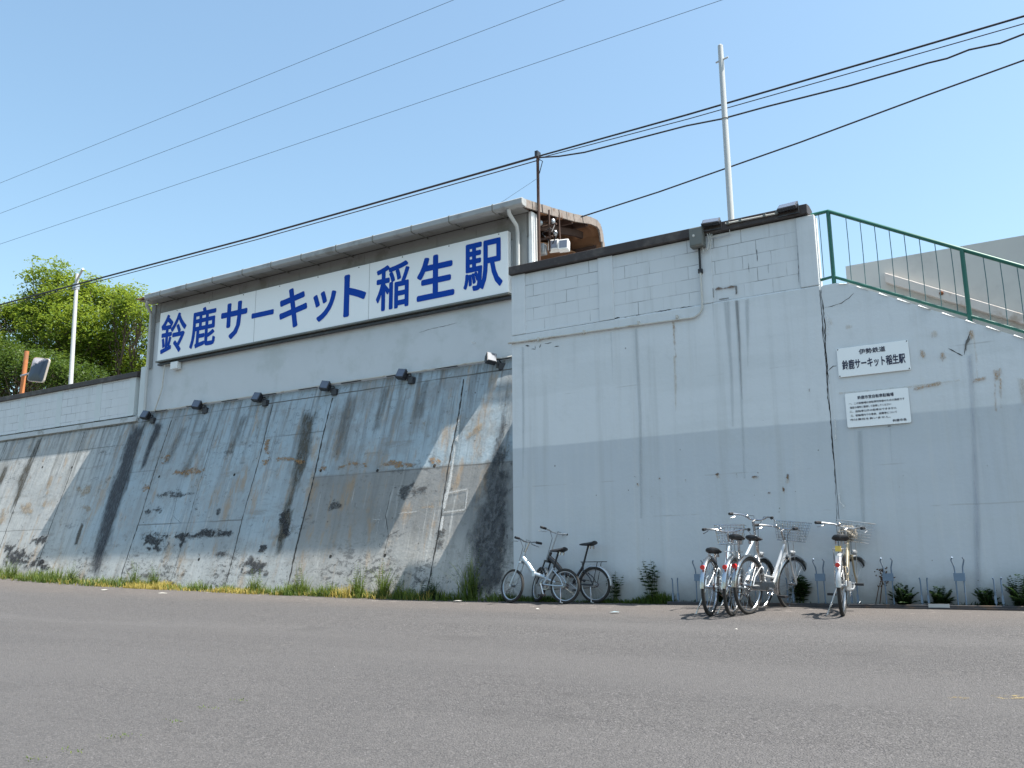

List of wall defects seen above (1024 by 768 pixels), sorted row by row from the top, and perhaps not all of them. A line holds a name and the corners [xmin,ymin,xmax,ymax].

crack [797,245,854,553]
leakage [93,424,161,572]
leakage [239,414,312,576]
leakage [467,424,507,593]